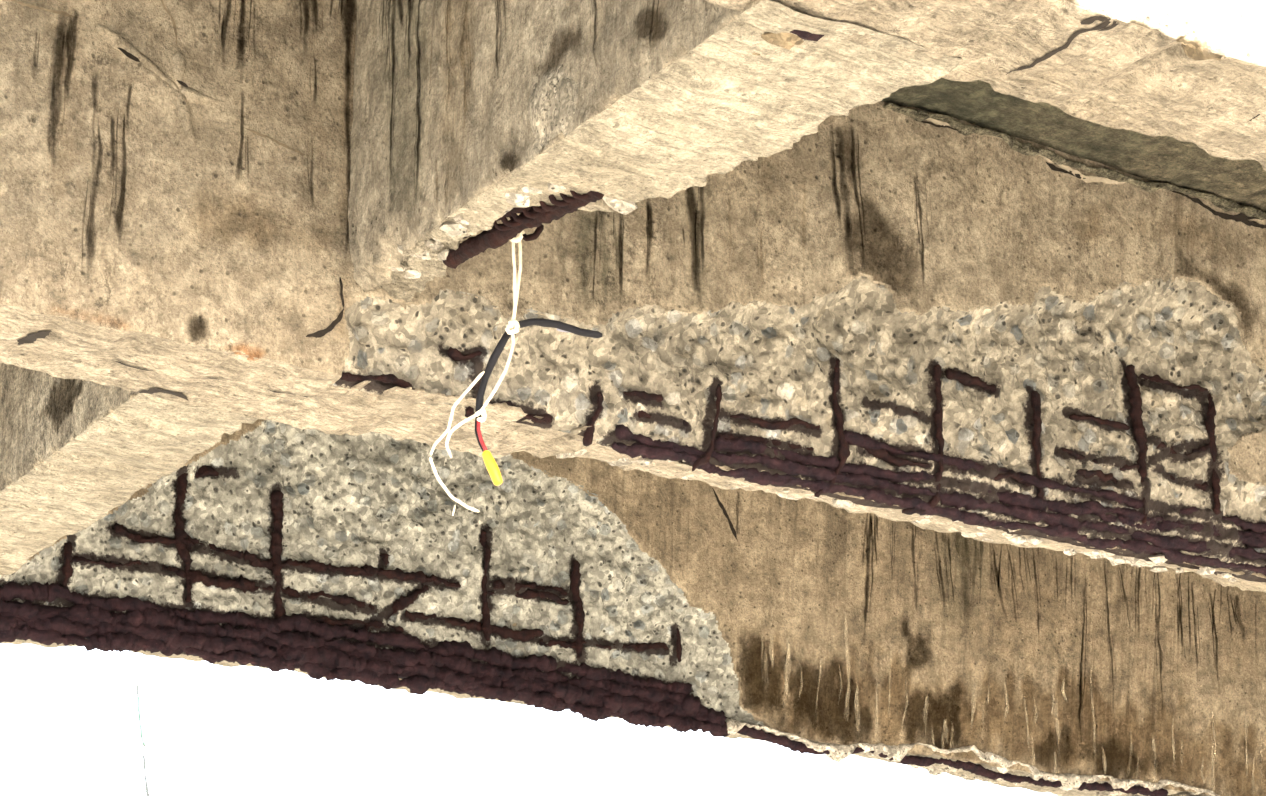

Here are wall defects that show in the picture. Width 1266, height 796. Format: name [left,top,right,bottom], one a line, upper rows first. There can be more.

leakage [52,18,77,133]
leakage [219,0,252,59]
leakage [304,0,354,150]
crack [1006,16,1118,75]
leakage [96,87,131,231]
leakage [832,132,901,288]
spalling [17,331,52,345]
spalling [139,388,189,401]
spalling [333,274,1266,583]
spalling [0,420,1220,796]
leakage [863,516,878,620]
leakage [1104,567,1239,675]